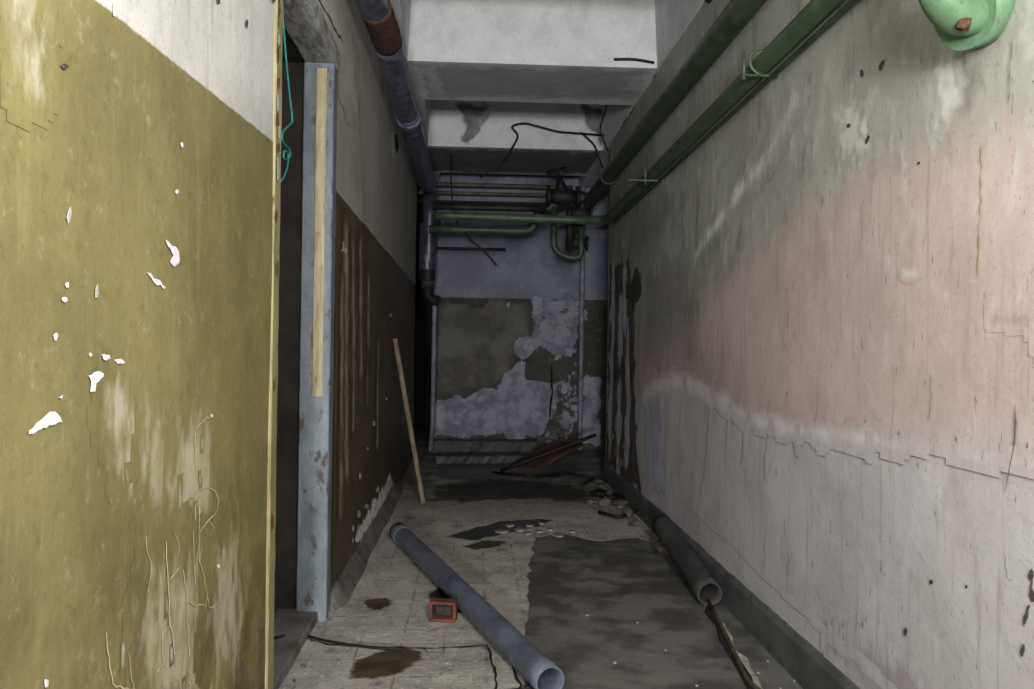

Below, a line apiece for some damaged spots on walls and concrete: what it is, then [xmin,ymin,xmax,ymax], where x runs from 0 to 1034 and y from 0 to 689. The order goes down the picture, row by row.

rust [359,0,402,56]
rust [956,18,972,32]
crack [1009,40,1034,101]
peeling [166,240,180,266]
water stain [337,94,380,530]
peeling [88,353,125,392]
peeling [434,255,641,493]